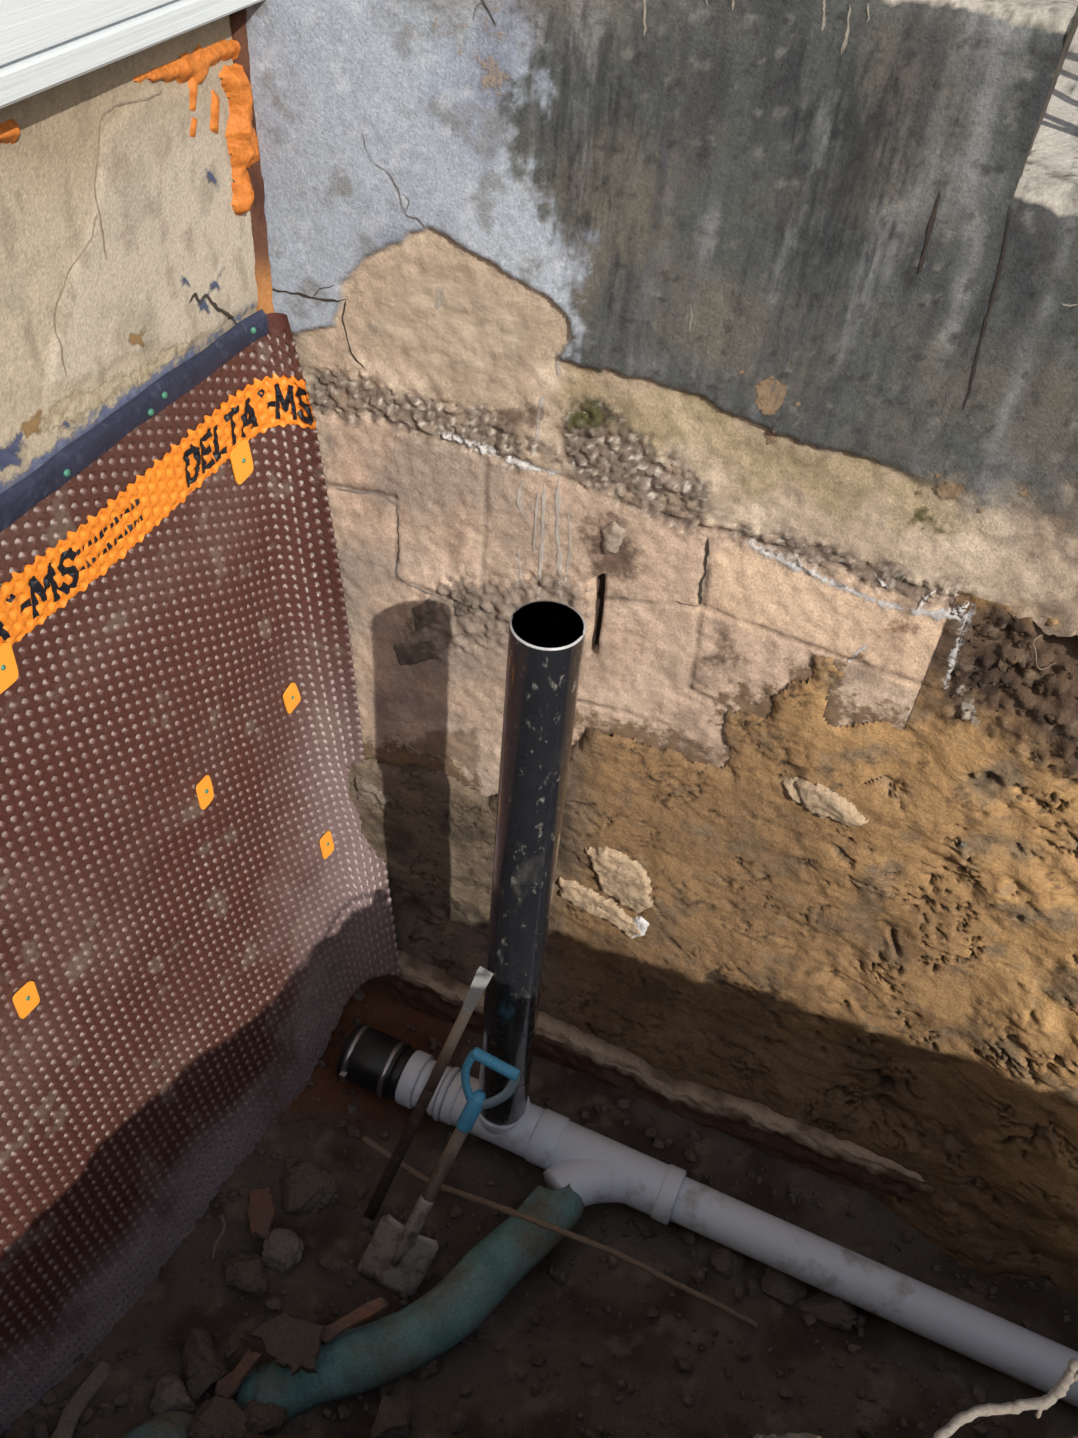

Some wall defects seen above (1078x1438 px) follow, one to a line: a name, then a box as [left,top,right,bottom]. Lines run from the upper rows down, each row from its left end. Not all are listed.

crack [54,89,163,377]
crack [918,189,941,274]
crack [272,285,364,368]
crack [962,203,1012,413]
spalling [739,369,801,445]
crack [677,537,709,607]
peeling [393,566,592,666]